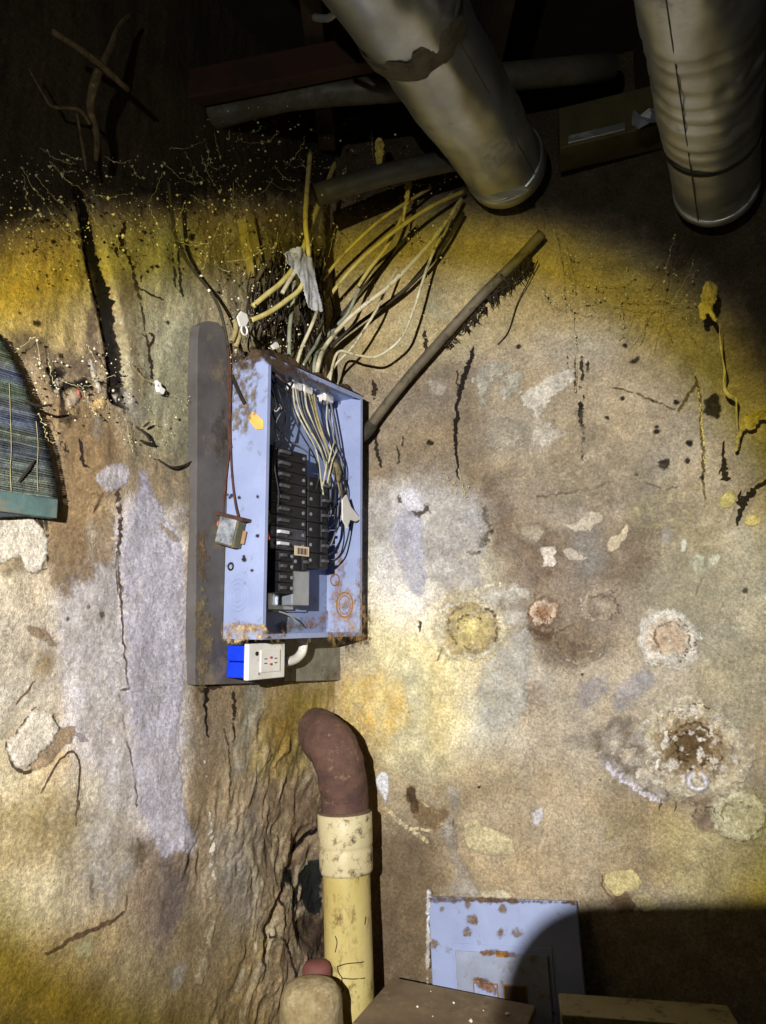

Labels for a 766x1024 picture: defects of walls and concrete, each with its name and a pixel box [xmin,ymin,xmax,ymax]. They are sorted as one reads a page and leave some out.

crack [71,187,164,413]
crack [453,346,475,481]
crack [613,375,706,507]
crack [536,482,607,498]
crack [736,479,766,526]
corrosion [527,594,560,640]
peeling [0,463,195,903]
crack [40,750,81,824]
water stain [609,707,691,787]
crack [45,864,128,955]
spalling [194,919,217,985]
spalling [232,845,305,993]